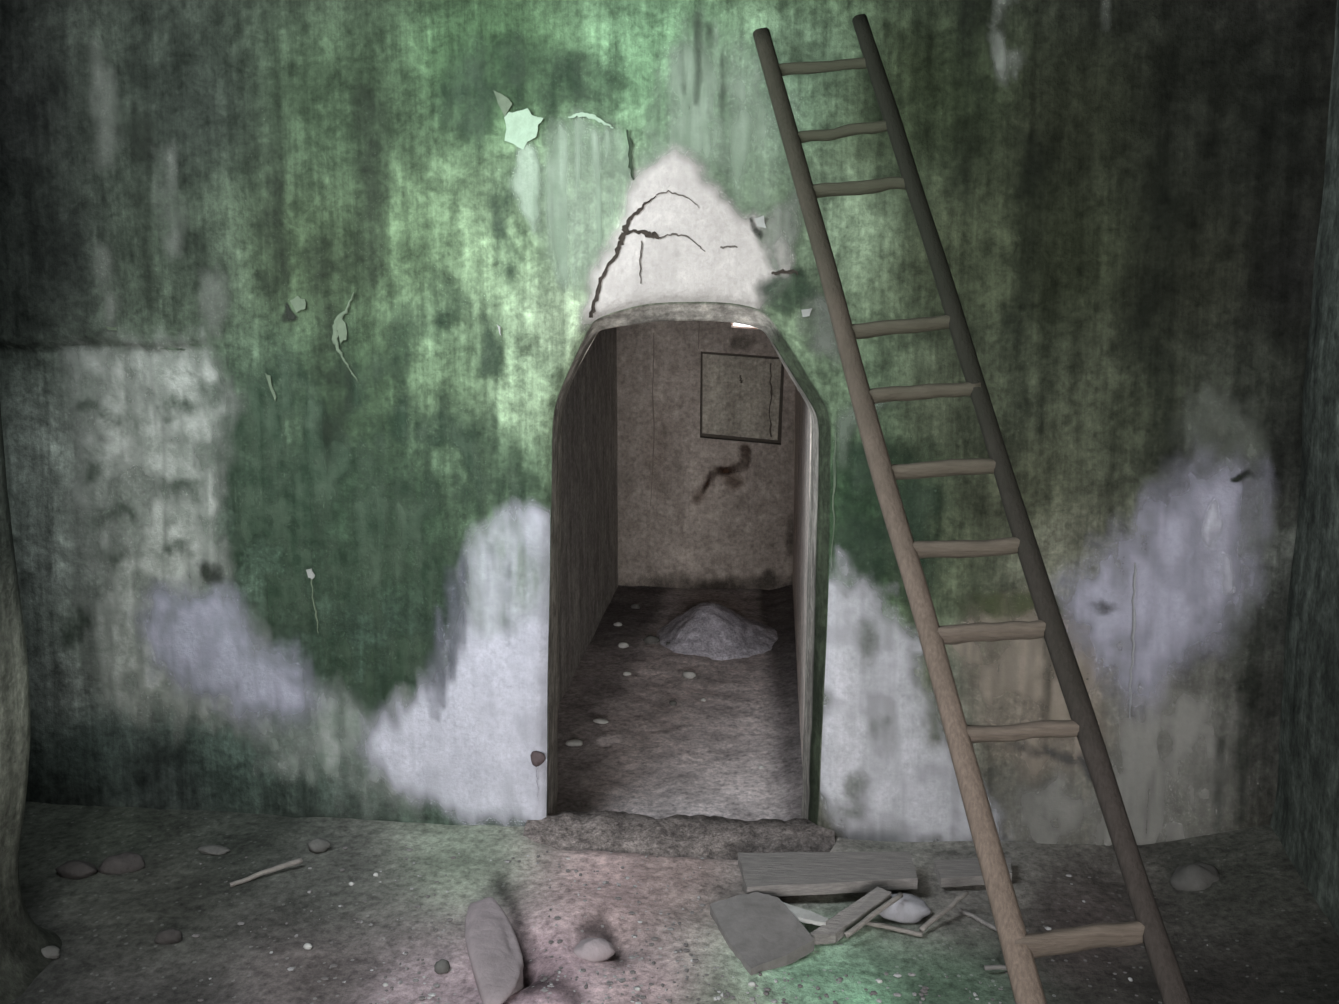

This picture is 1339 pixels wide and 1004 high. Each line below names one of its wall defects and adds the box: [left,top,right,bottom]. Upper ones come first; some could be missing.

flaking render [493,90,800,324]
crack [589,130,737,318]
water stain [436,558,465,687]